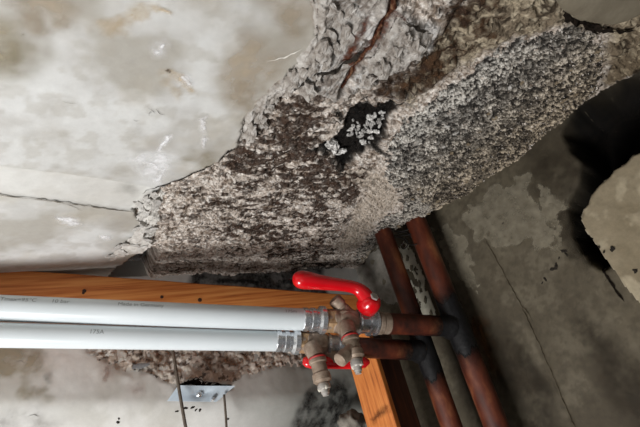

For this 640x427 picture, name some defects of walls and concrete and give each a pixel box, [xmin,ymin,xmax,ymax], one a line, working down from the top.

corrosion [340,0,405,88]
crack [1,195,138,212]
leakage [160,0,502,293]
spalling [105,0,640,315]
spalling [86,349,306,385]
crack [485,239,575,426]